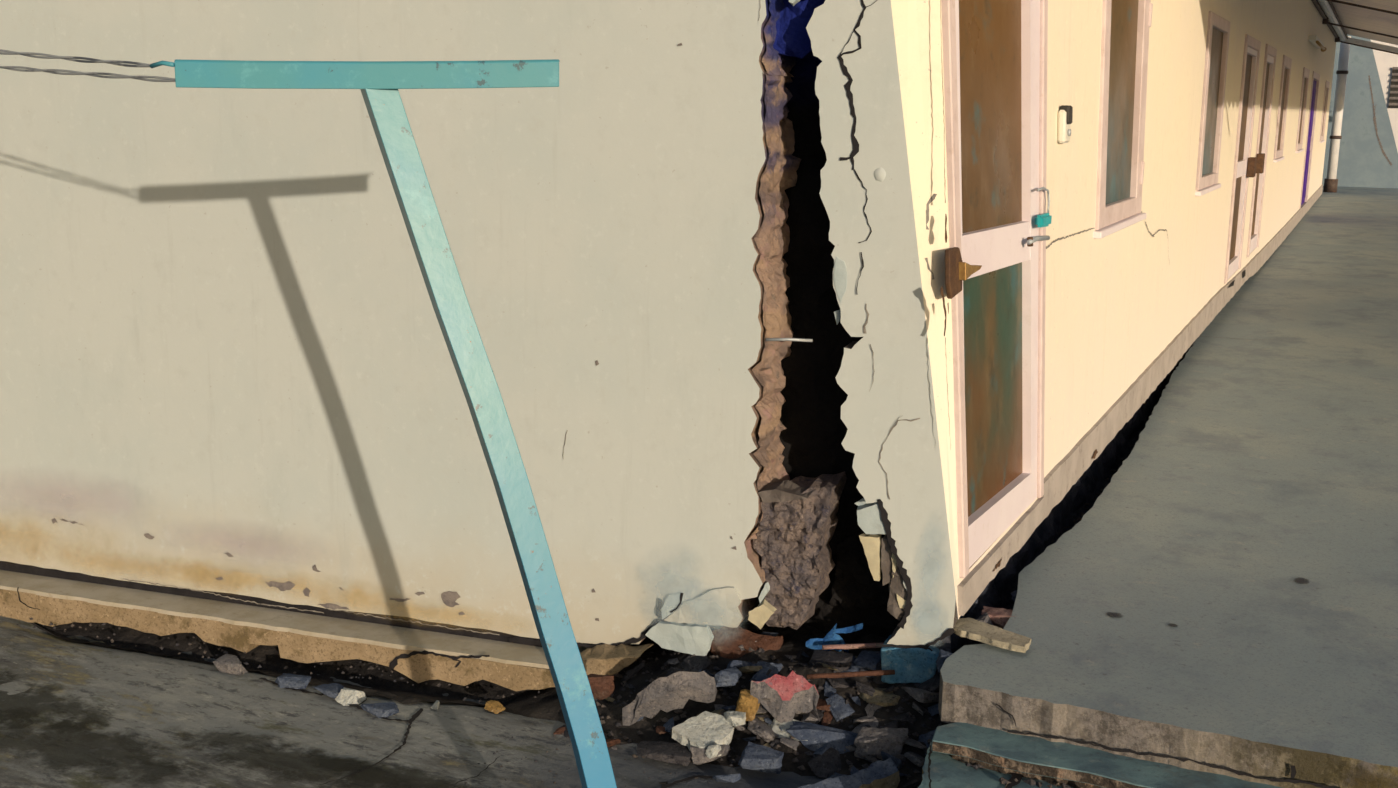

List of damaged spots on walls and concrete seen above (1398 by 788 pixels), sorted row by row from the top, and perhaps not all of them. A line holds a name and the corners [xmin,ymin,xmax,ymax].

crack [1046,228,1095,249]
crack [746,0,955,651]
crack [0,561,542,669]
crack [577,625,652,648]
crack [996,704,1335,788]